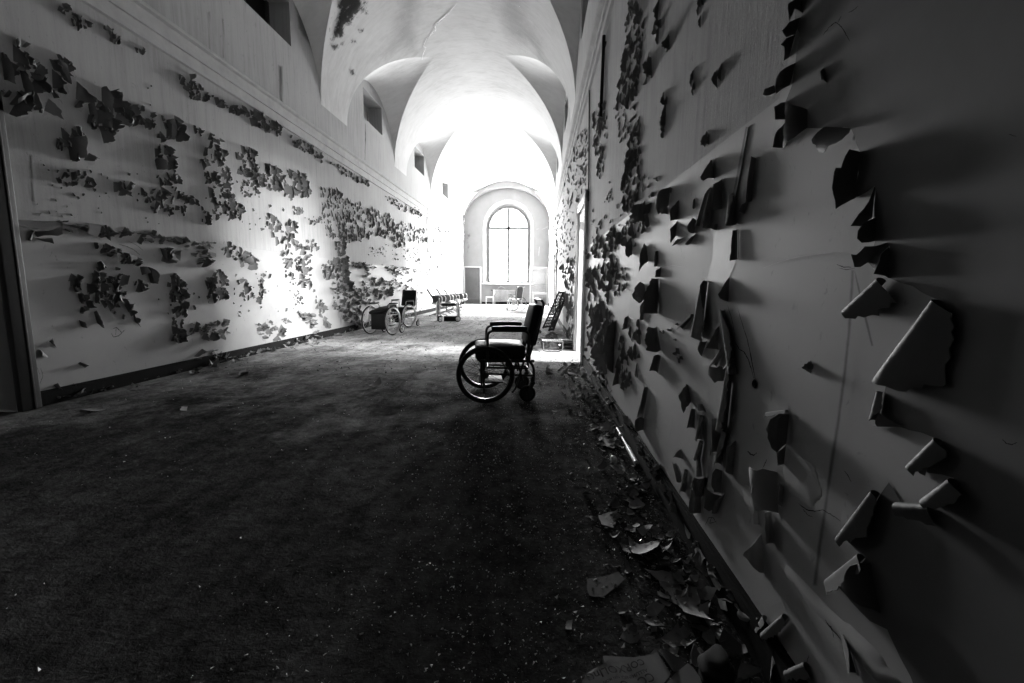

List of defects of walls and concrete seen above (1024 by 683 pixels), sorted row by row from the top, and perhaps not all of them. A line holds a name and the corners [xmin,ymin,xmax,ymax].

peeling [1,38,461,365]
peeling [539,0,789,656]
peeling [763,0,1024,683]